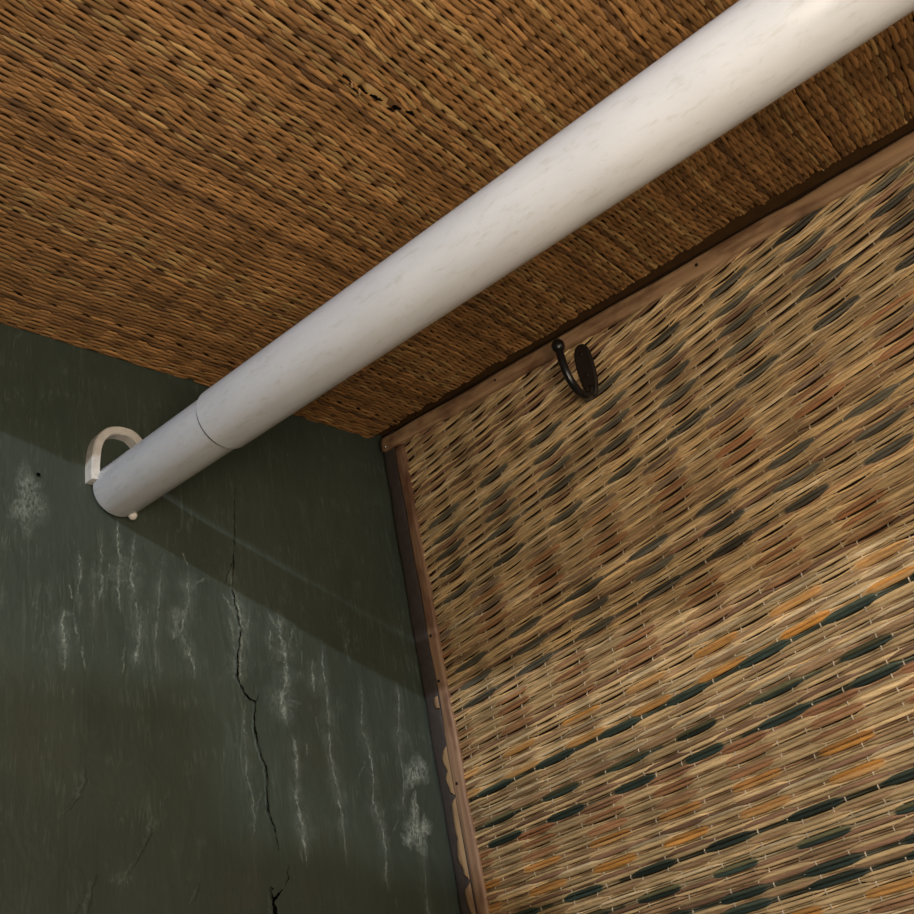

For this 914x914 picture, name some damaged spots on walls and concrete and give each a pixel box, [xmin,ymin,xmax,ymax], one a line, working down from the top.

crack [225,488,289,914]